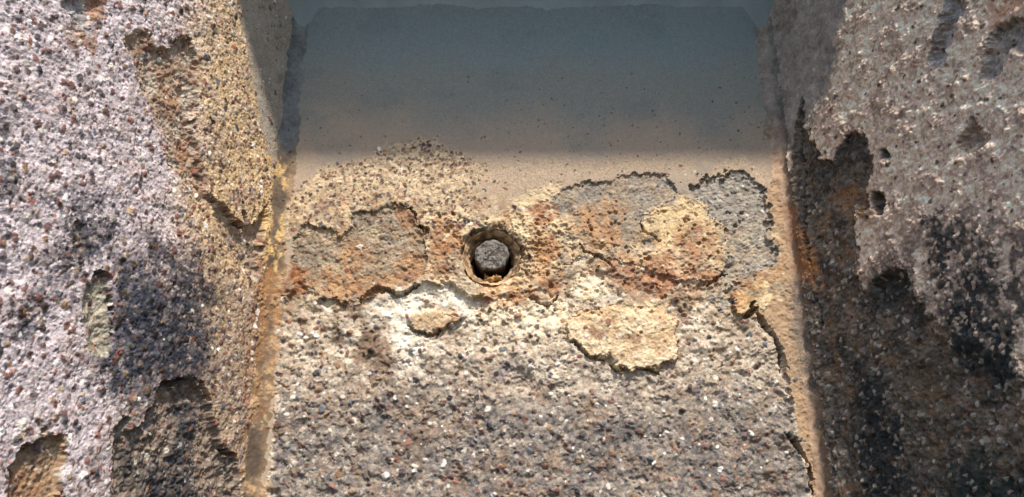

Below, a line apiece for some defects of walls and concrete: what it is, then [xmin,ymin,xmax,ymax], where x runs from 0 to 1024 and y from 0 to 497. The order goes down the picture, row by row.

spalling [122,26,267,280]
spalling [4,425,72,497]
spalling [109,373,242,497]
rust [237,203,466,451]
spalling [264,167,814,497]
crack [741,300,786,374]
crack [784,431,816,495]
spalling [789,96,1024,497]